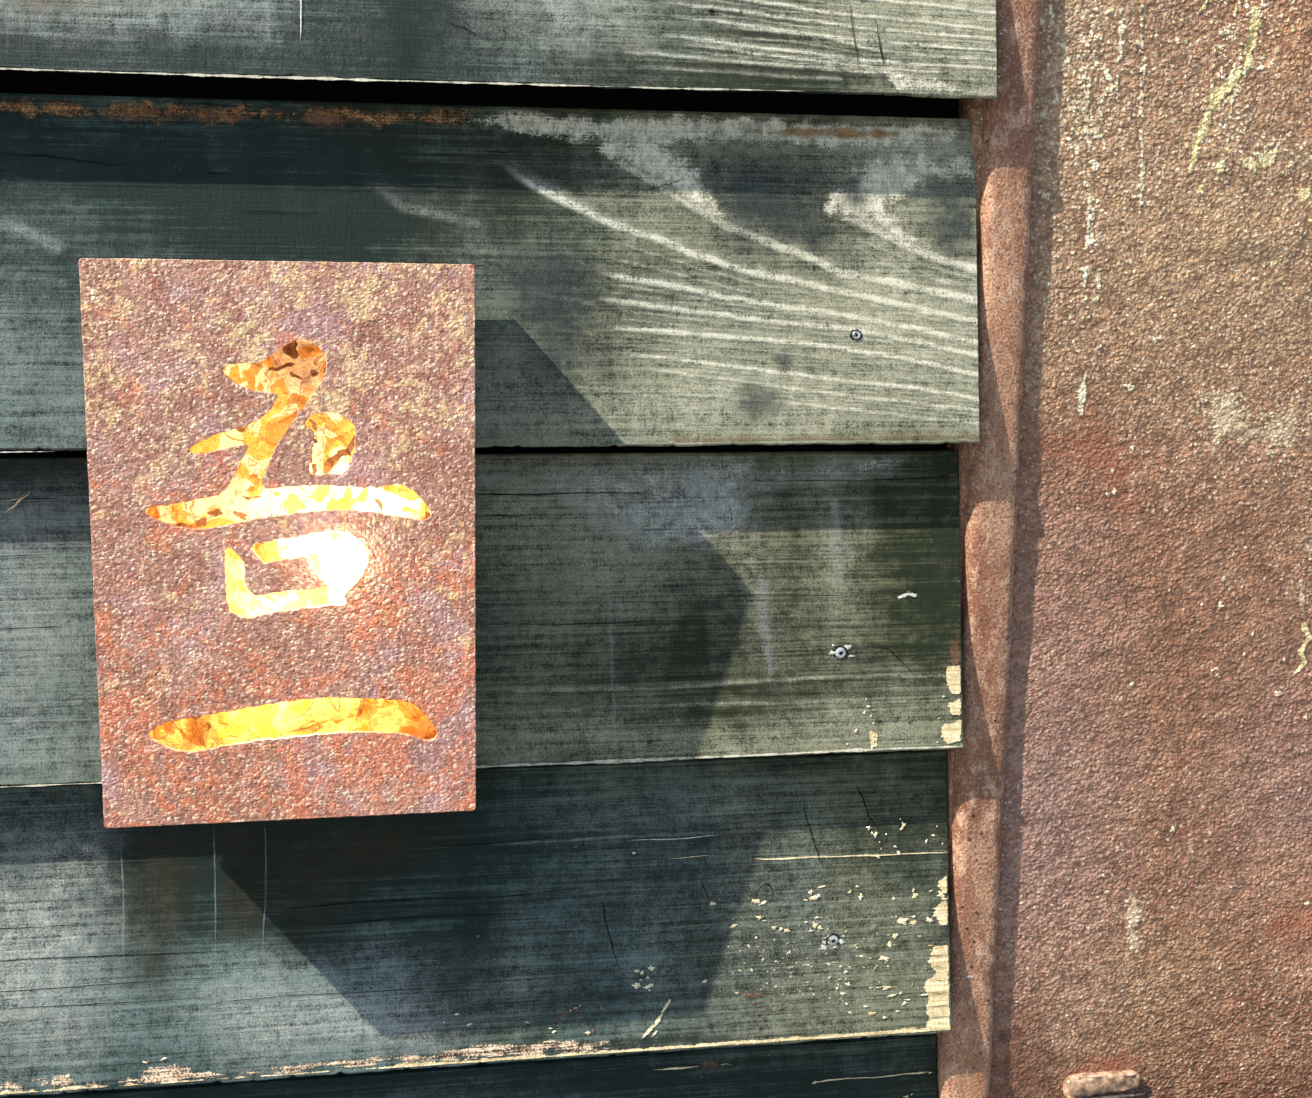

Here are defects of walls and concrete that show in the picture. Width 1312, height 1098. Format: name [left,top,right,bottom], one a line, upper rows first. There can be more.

rust [0,98,470,127]
peeling [936,638,961,744]
peeling [0,876,979,1095]